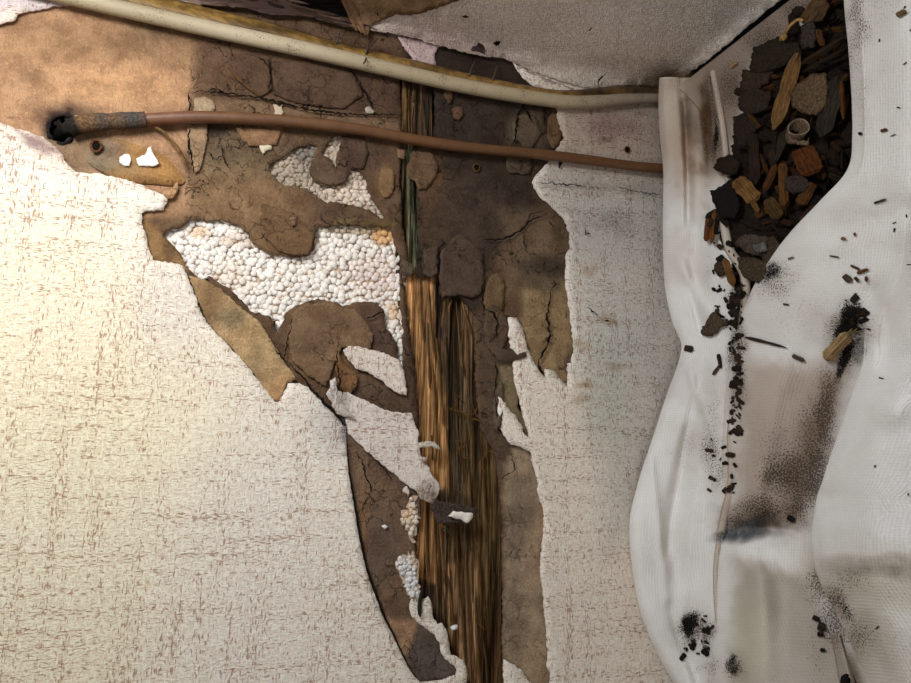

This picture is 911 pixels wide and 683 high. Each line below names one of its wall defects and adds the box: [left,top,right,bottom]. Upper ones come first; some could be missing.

crack [187,56,403,172]
crack [511,104,546,146]
crack [537,162,586,195]
crack [436,238,445,272]
crack [484,211,553,248]
peeling [0,0,573,683]
crack [481,277,499,430]
crack [538,281,574,379]
crack [276,319,420,681]